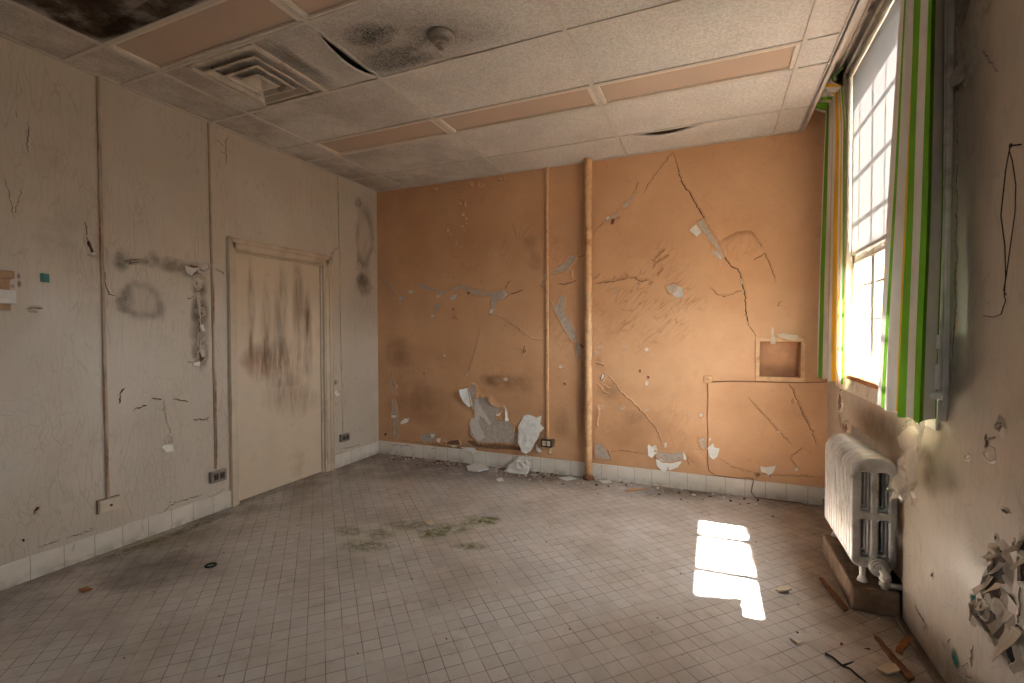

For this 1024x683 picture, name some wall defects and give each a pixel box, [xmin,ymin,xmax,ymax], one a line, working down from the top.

mould [38,0,175,37]
crack [558,248,669,285]
peeling [690,218,725,259]
crack [644,151,782,336]
peeling [539,251,607,383]
peeling [383,369,557,472]
peeling [593,441,688,472]
crack [686,383,822,478]
peeling [968,533,1024,674]